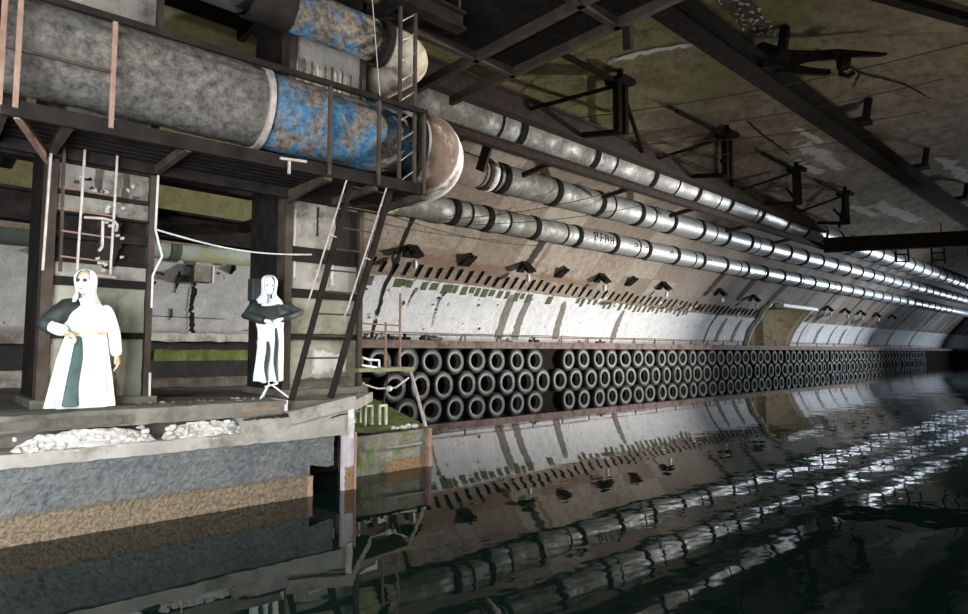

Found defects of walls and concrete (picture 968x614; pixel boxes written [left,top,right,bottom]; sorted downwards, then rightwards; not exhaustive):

spalling [717,0,777,44]